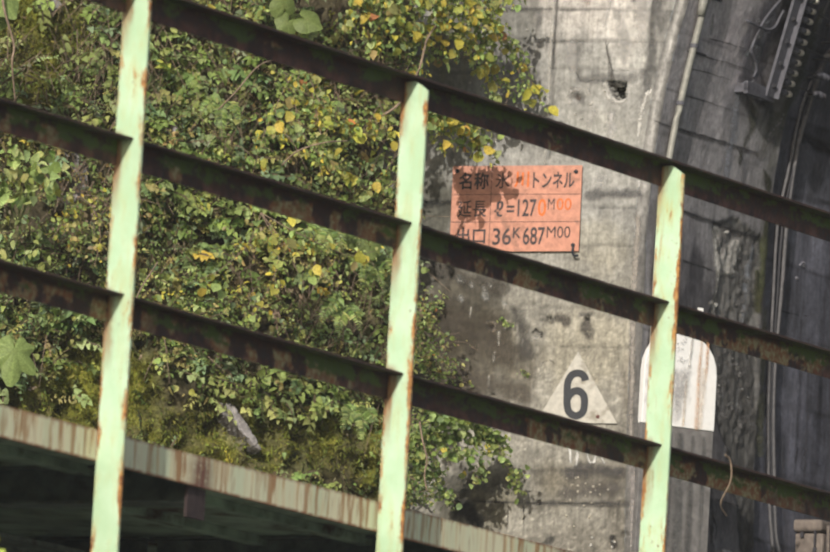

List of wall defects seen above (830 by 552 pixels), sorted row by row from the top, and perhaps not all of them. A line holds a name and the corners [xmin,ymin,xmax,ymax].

spalling [603,81,627,103]
water stain [724,0,830,179]